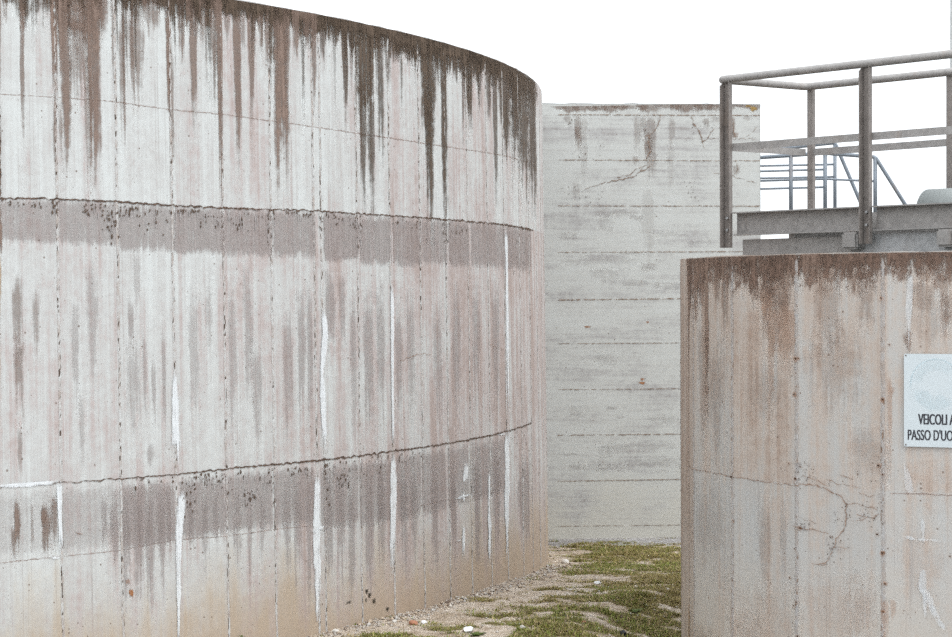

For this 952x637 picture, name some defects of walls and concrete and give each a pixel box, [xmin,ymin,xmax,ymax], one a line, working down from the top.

leakage [50,0,108,169]
crack [0,94,528,163]
crack [0,197,533,231]
leakage [120,0,537,407]
leakage [563,105,647,113]
crack [558,114,760,207]
leakage [320,313,328,439]
crack [38,422,532,485]
leakage [0,481,63,559]
leakage [120,473,273,635]
leakage [313,480,324,614]
crack [558,466,952,566]